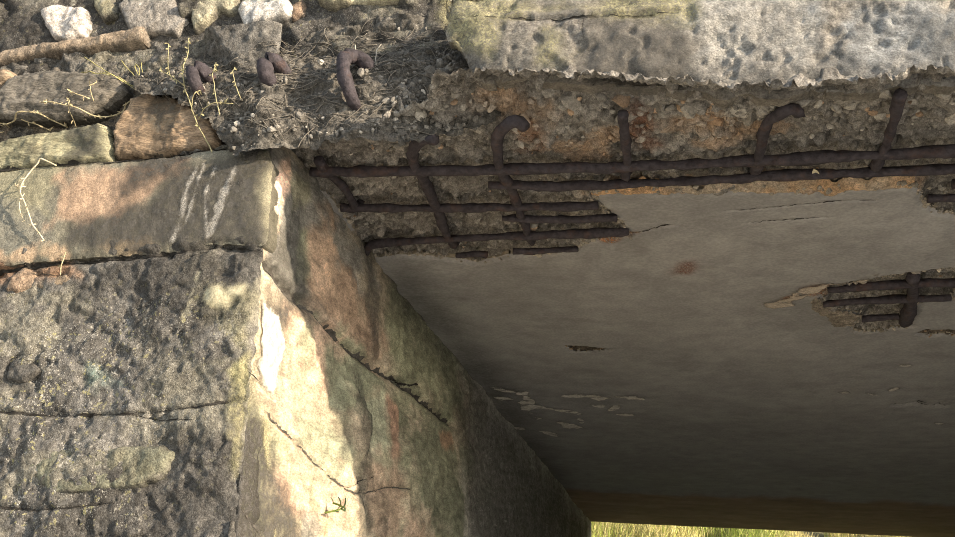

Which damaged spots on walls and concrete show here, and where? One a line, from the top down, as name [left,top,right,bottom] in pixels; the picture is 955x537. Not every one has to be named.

spalling [129,12,955,263]
crack [742,200,876,223]
crack [0,245,449,426]
peeling [204,284,246,307]
spalling [764,267,955,338]
peeling [492,387,585,437]
crack [267,412,411,495]
crack [0,502,111,511]